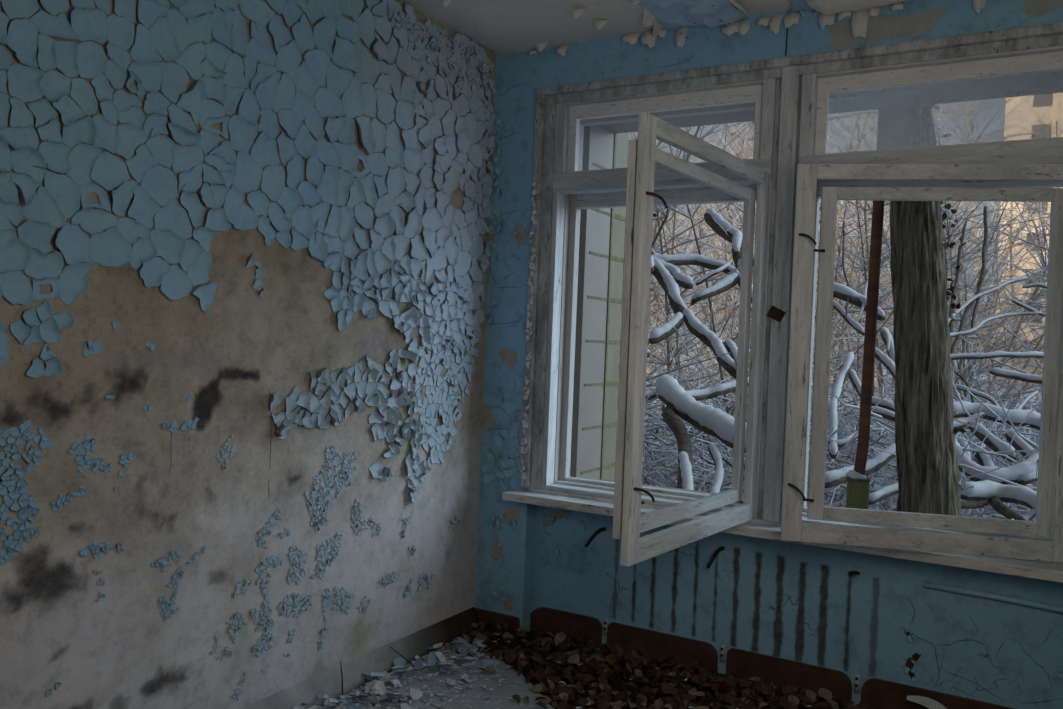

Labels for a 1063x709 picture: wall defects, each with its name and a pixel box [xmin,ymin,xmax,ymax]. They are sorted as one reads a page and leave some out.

peeling [622,0,955,52]
damp [116,370,145,398]
damp [193,369,259,429]
peeling [0,0,496,671]
damp [8,553,73,608]
damp [144,674,182,694]
damp [731,548,740,647]
damp [751,553,762,652]
damp [773,556,784,657]
damp [795,563,806,661]
damp [818,565,829,666]
crack [907,597,1058,704]